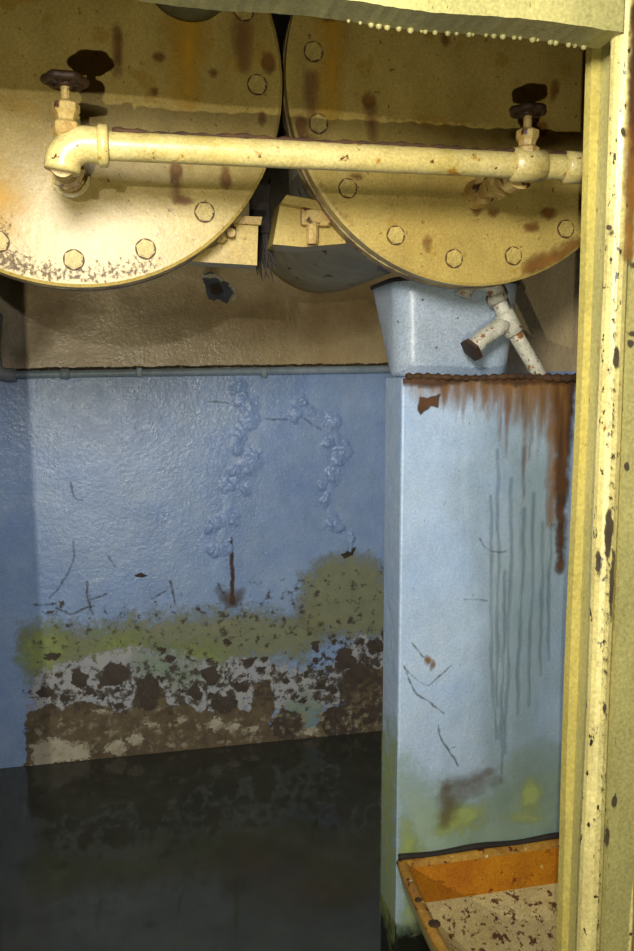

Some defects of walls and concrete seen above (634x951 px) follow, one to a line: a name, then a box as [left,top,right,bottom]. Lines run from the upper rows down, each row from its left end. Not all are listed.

rust [624,0,634,259]
spalling [201,272,238,303]
rust [403,372,577,573]
spalling [22,627,384,766]